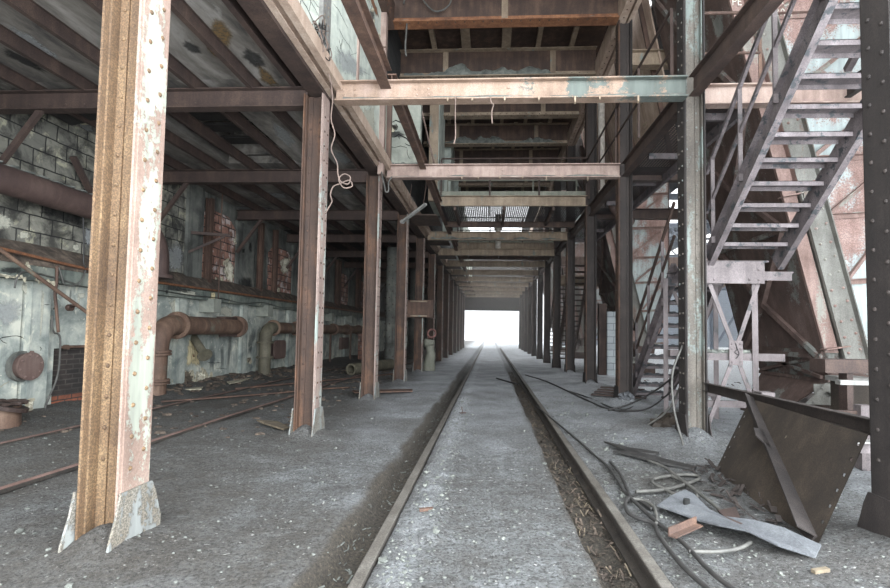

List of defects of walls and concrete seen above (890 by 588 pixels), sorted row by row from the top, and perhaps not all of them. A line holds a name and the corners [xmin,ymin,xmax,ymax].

peeling [215,258,234,282]